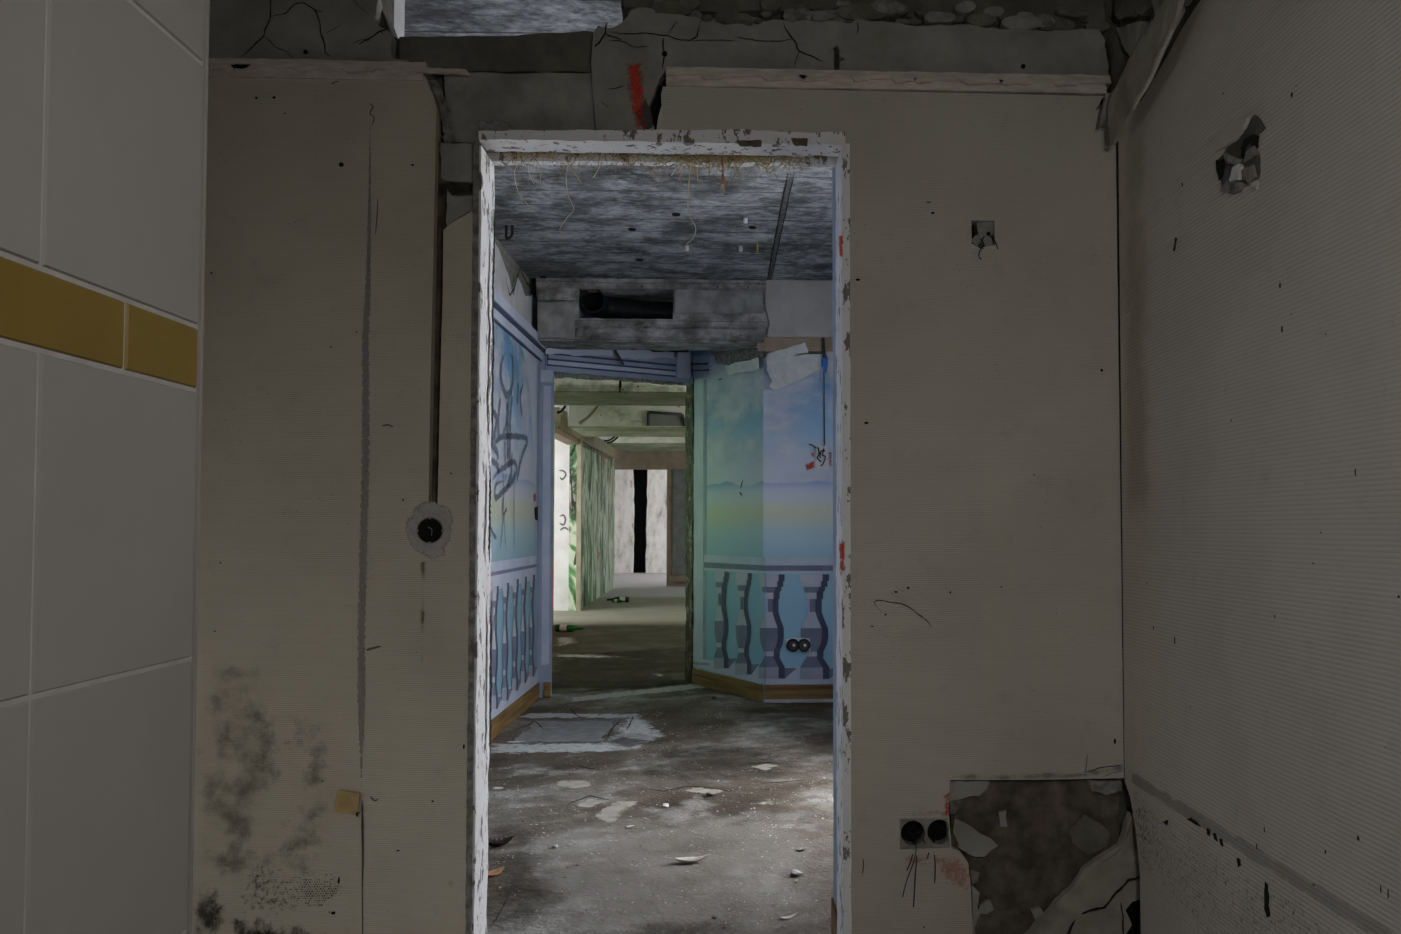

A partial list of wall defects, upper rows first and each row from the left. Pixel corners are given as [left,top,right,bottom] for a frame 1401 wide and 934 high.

crack [240,0,388,59]
peeling [1105,0,1200,145]
hole [1216,115,1266,194]
spalling [949,778,1140,934]
mould [197,895,273,934]